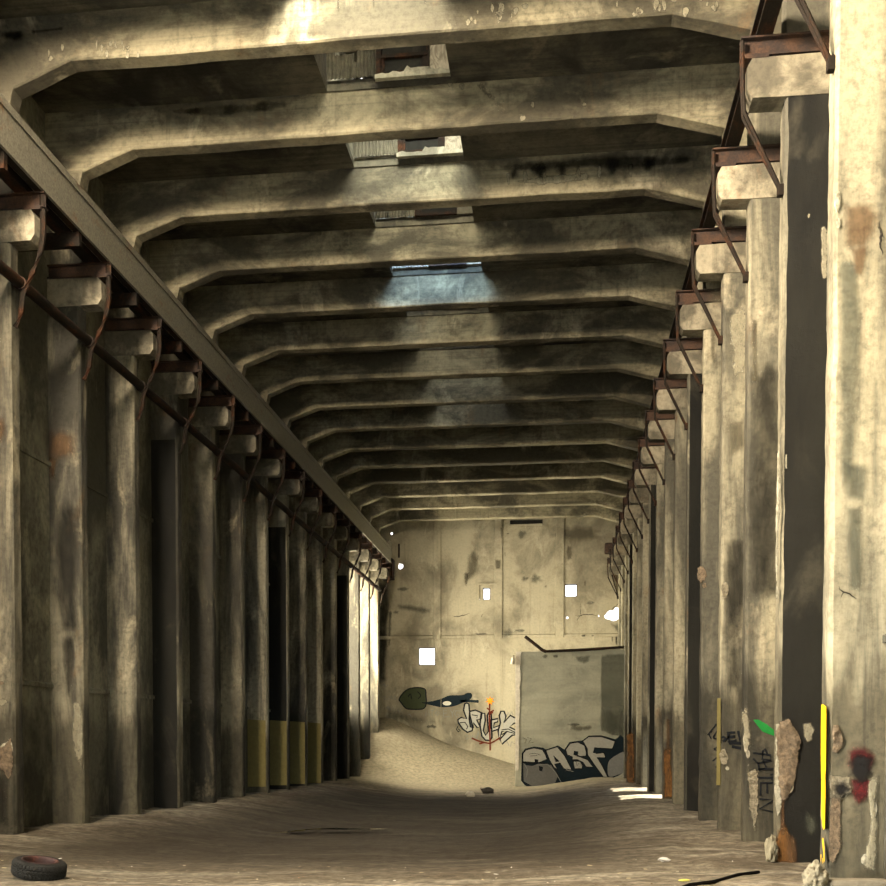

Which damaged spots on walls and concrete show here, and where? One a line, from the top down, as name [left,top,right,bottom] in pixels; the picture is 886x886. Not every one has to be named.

spalling [0,738,13,779]
peeling [742,708,751,758]
spalling [774,718,814,817]
peeling [747,769,758,828]